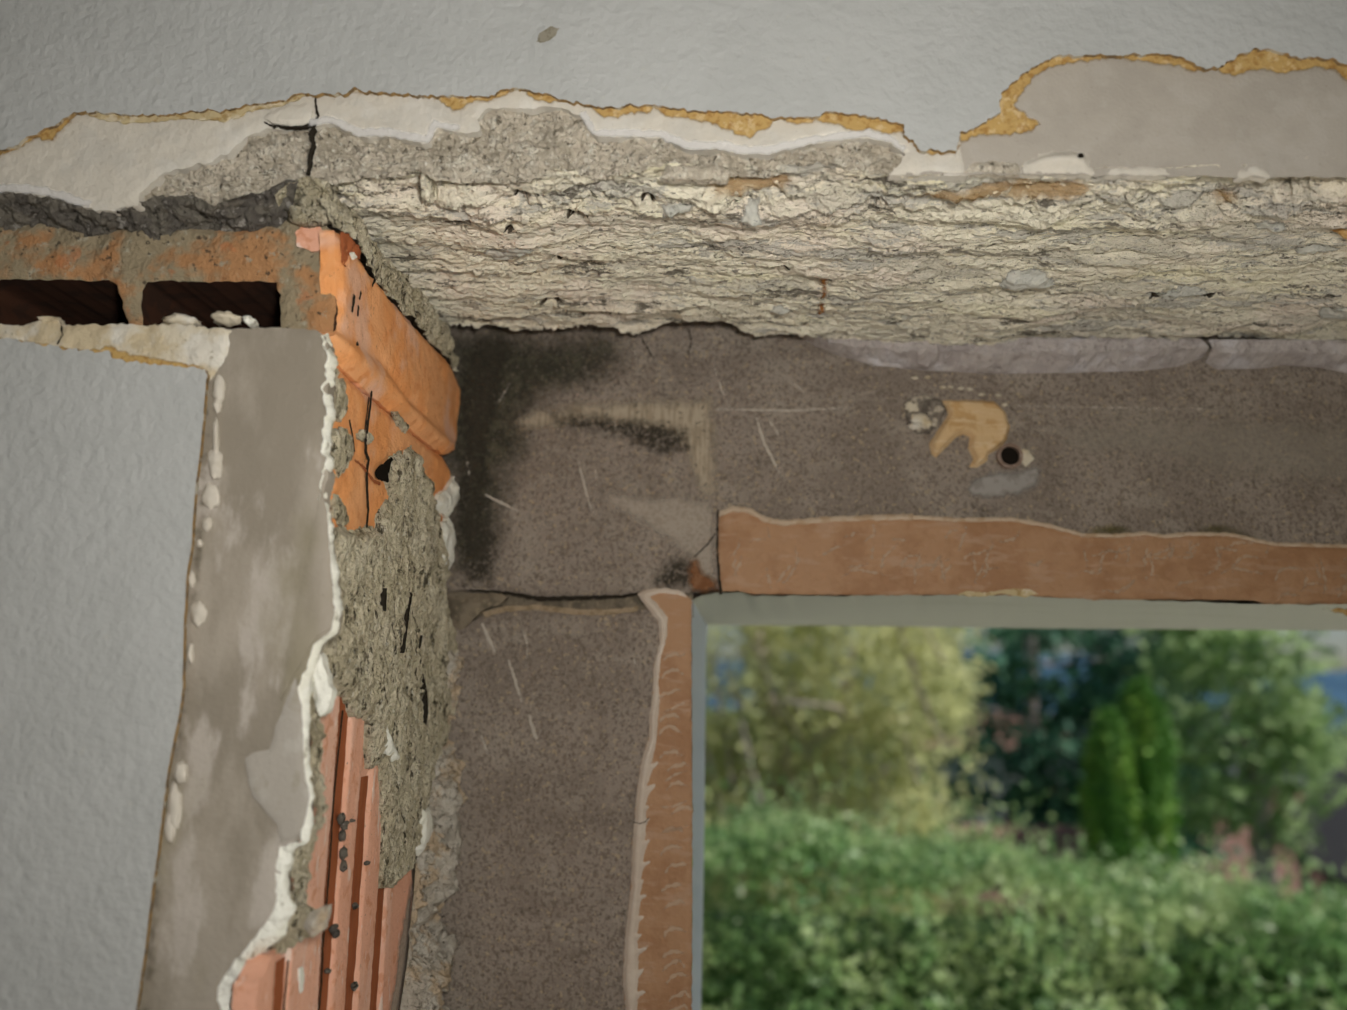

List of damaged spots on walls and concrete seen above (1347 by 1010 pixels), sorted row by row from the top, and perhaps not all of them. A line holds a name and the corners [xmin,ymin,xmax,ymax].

crack [264,97,320,176]
peeling [0,50,1347,240]
spalling [340,232,361,267]
peeling [0,320,232,380]
crack [349,391,381,528]
spalling [375,457,393,483]
flaking render [217,333,347,1010]